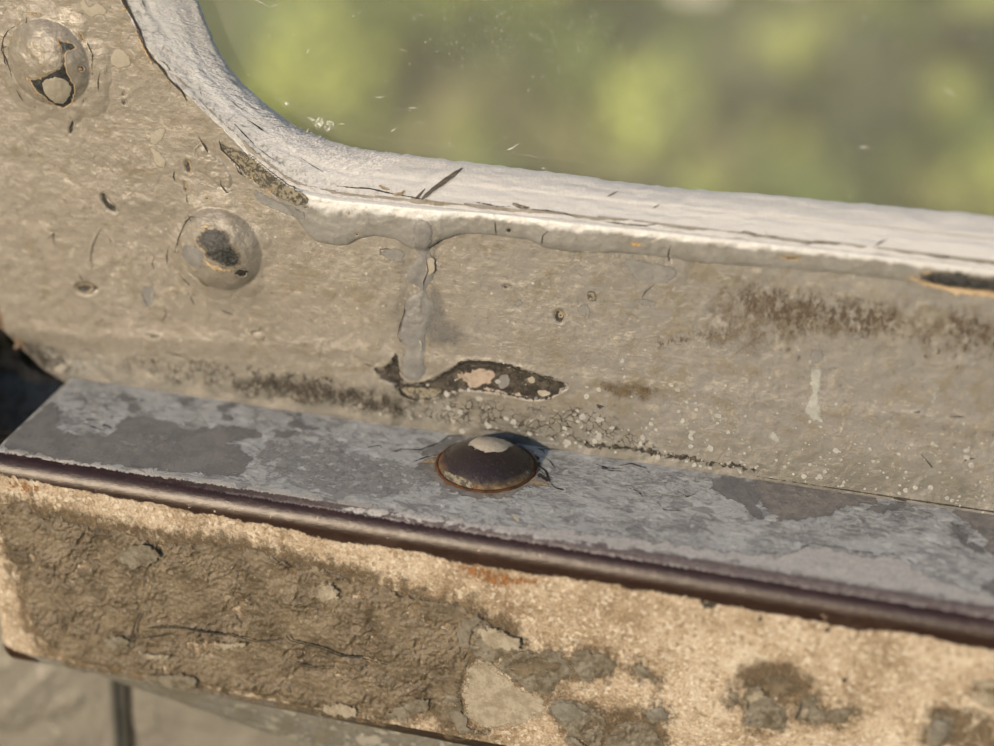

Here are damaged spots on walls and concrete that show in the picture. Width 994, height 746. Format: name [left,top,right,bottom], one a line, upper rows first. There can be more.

peeling [26,32,93,109]
peeling [182,224,248,278]
peeling [907,271,994,299]
peeling [374,353,567,402]
rust [415,445,550,500]
peeling [4,393,994,607]
peeling [0,491,673,746]
peeling [724,662,861,734]
peeling [920,708,959,746]